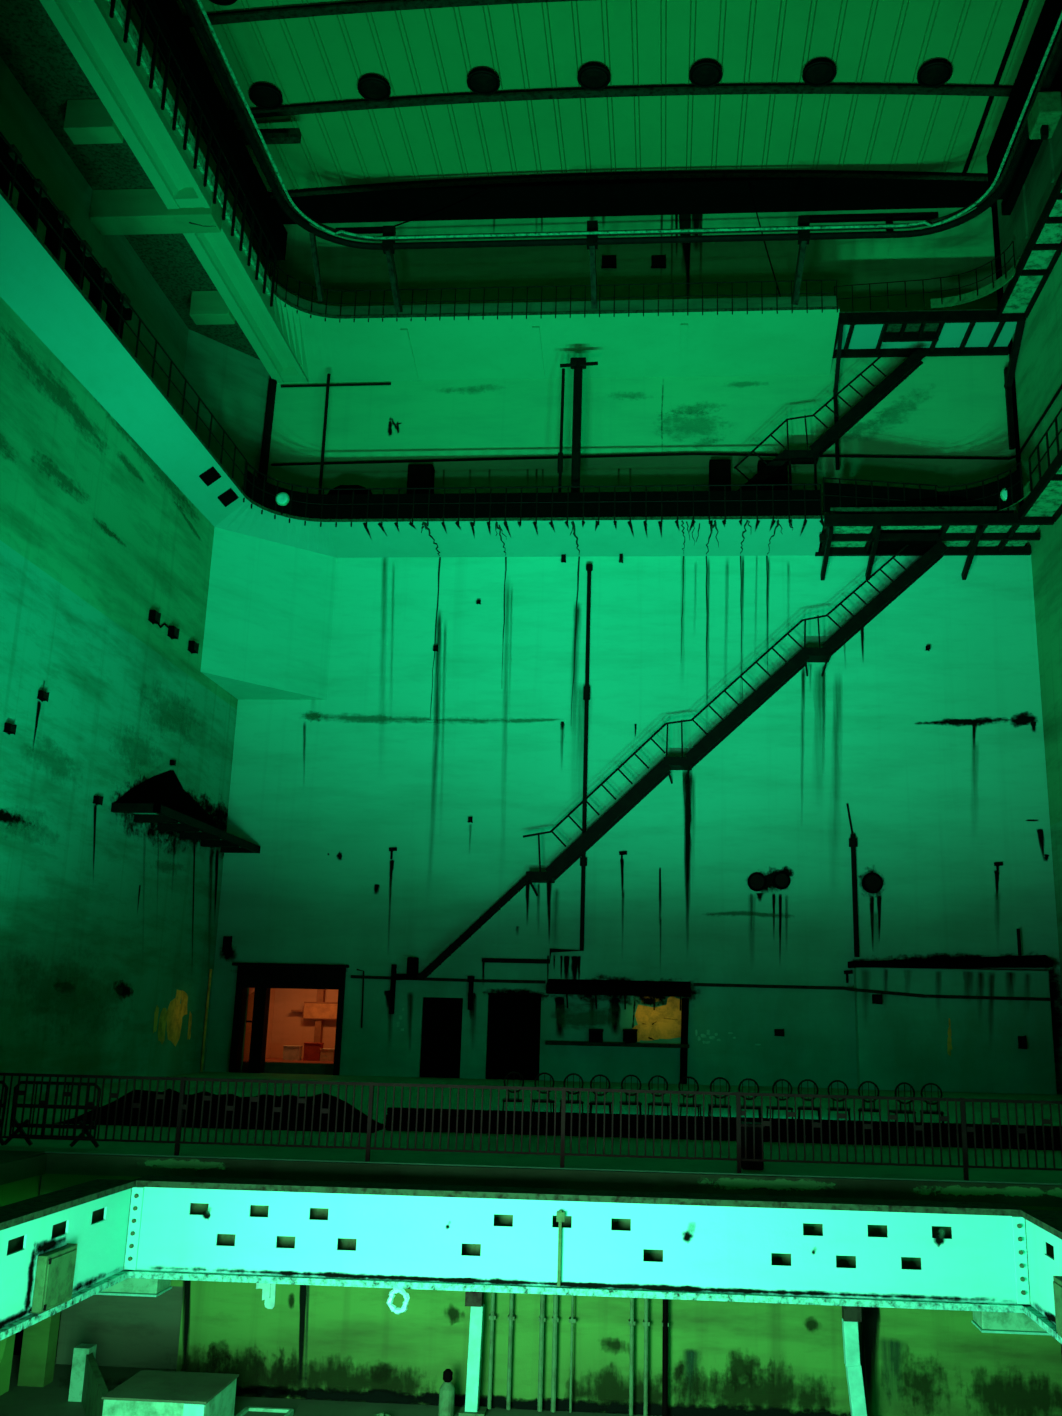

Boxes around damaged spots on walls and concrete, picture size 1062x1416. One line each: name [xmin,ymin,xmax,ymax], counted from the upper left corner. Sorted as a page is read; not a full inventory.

damp [307,617,555,763]
damp [917,712,1037,763]